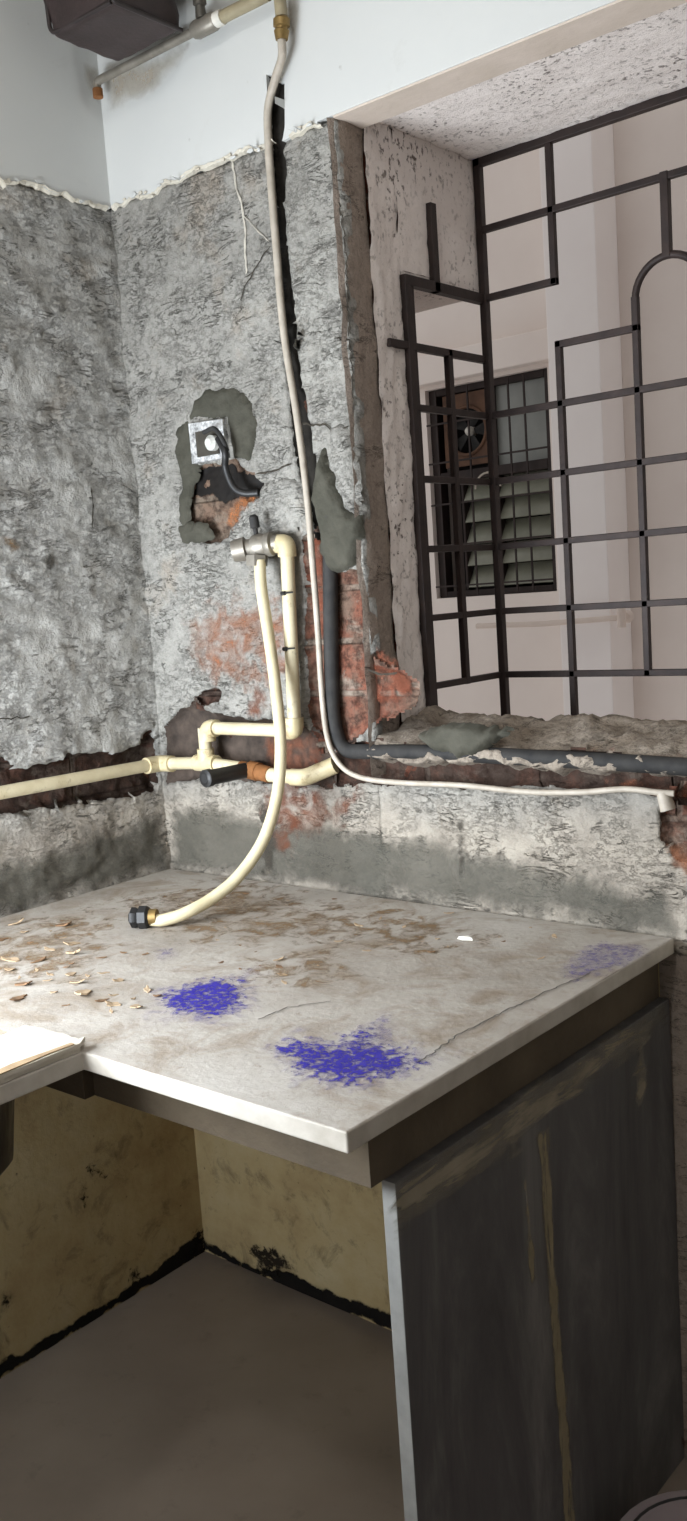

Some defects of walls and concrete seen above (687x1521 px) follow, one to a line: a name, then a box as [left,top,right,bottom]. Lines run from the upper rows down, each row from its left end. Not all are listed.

spalling [190,459,264,544]
spalling [0,526,687,871]
crack [259,1001,329,1019]
crack [417,973,588,1062]
damp [0,1230,392,1379]